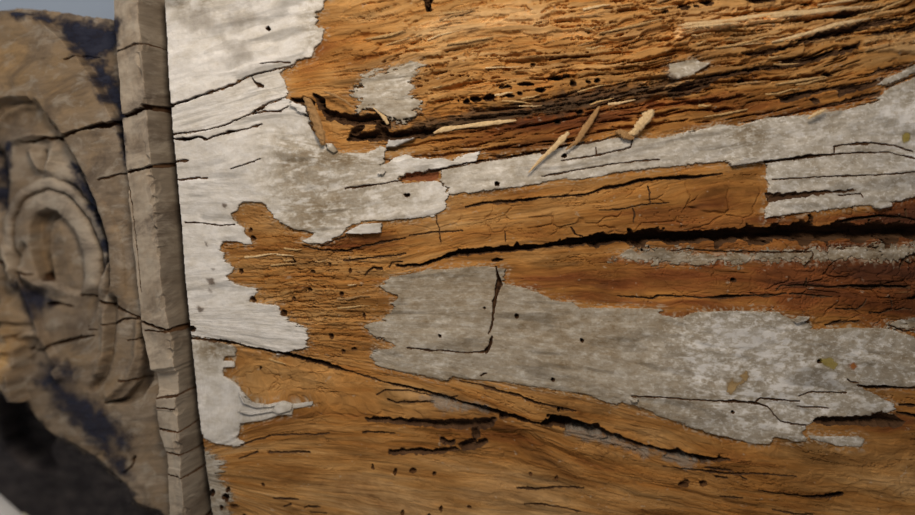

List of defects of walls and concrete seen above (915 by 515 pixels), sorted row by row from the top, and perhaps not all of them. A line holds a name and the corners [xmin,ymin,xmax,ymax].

crack [21,62,296,250]
peeling [204,447,237,515]
crack [0,135,915,515]
peeling [165,0,915,447]